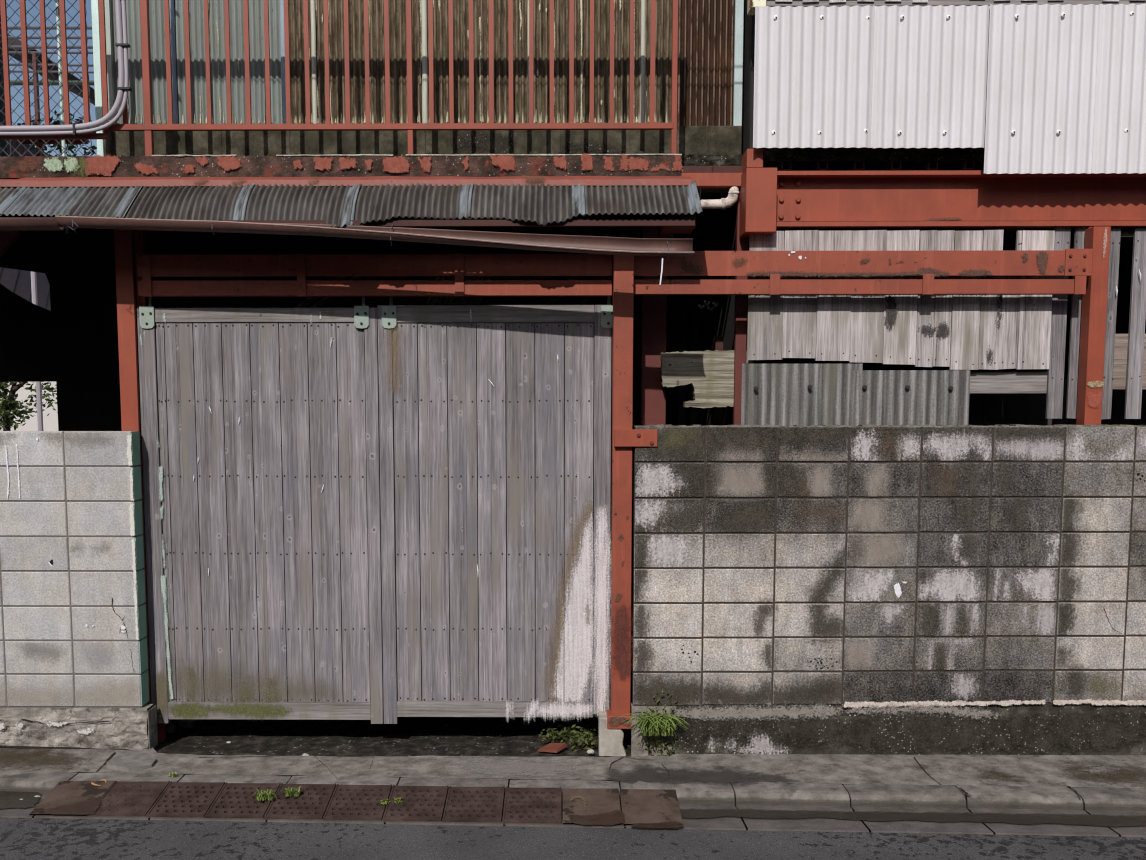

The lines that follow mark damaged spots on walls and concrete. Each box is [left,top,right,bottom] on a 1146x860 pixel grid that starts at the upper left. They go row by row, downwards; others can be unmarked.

peeling [84,154,121,176]
peeling [134,162,157,175]
peeling [182,155,243,174]
peeling [293,156,431,173]
peeling [490,154,516,171]
peeling [553,156,567,170]
peeling [580,153,683,172]
water stain [634,427,1146,756]
water stain [506,506,611,719]
water stain [606,765,796,785]